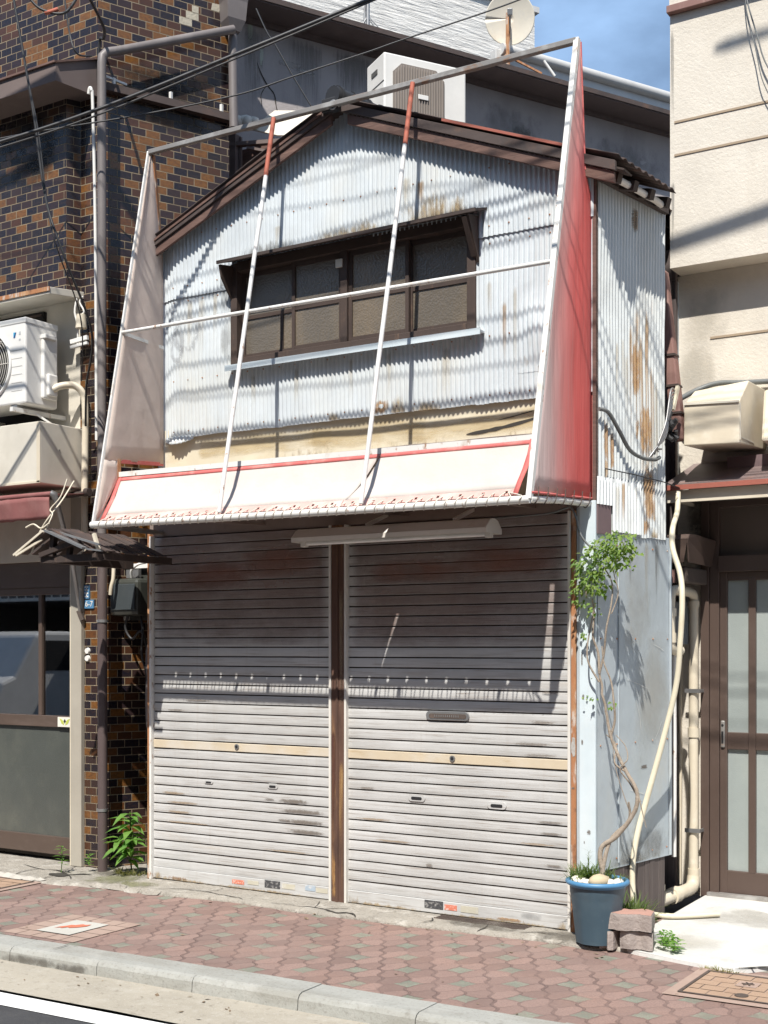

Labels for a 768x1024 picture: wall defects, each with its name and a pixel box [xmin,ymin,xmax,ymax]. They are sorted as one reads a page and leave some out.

rust [417,183,460,219]
rust [630,319,648,391]
rust [637,401,652,451]
rust [644,471,657,538]